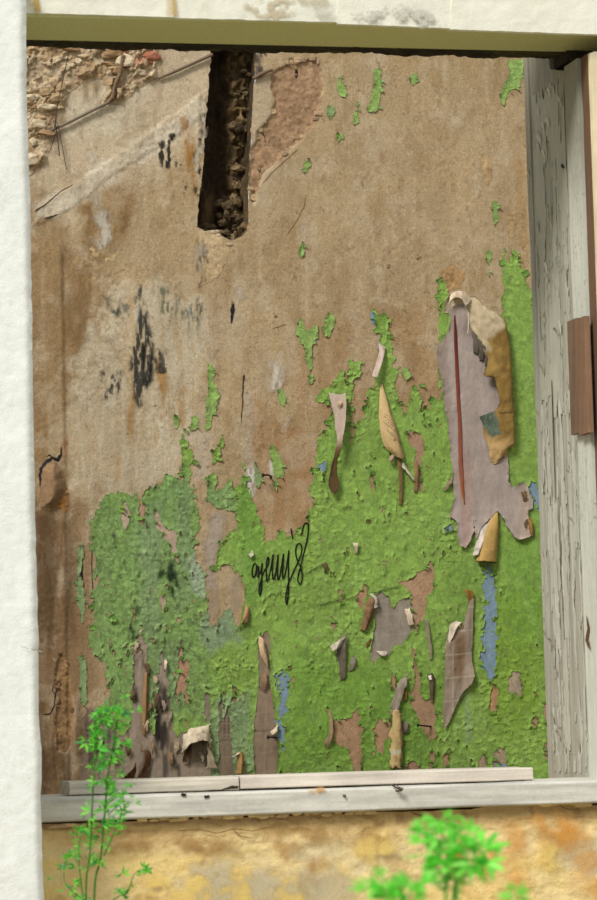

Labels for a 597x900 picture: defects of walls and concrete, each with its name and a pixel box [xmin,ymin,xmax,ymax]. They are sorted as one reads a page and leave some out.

flaking render [26,46,161,176]
flaking render [247,57,336,202]
peeling [53,80,590,779]